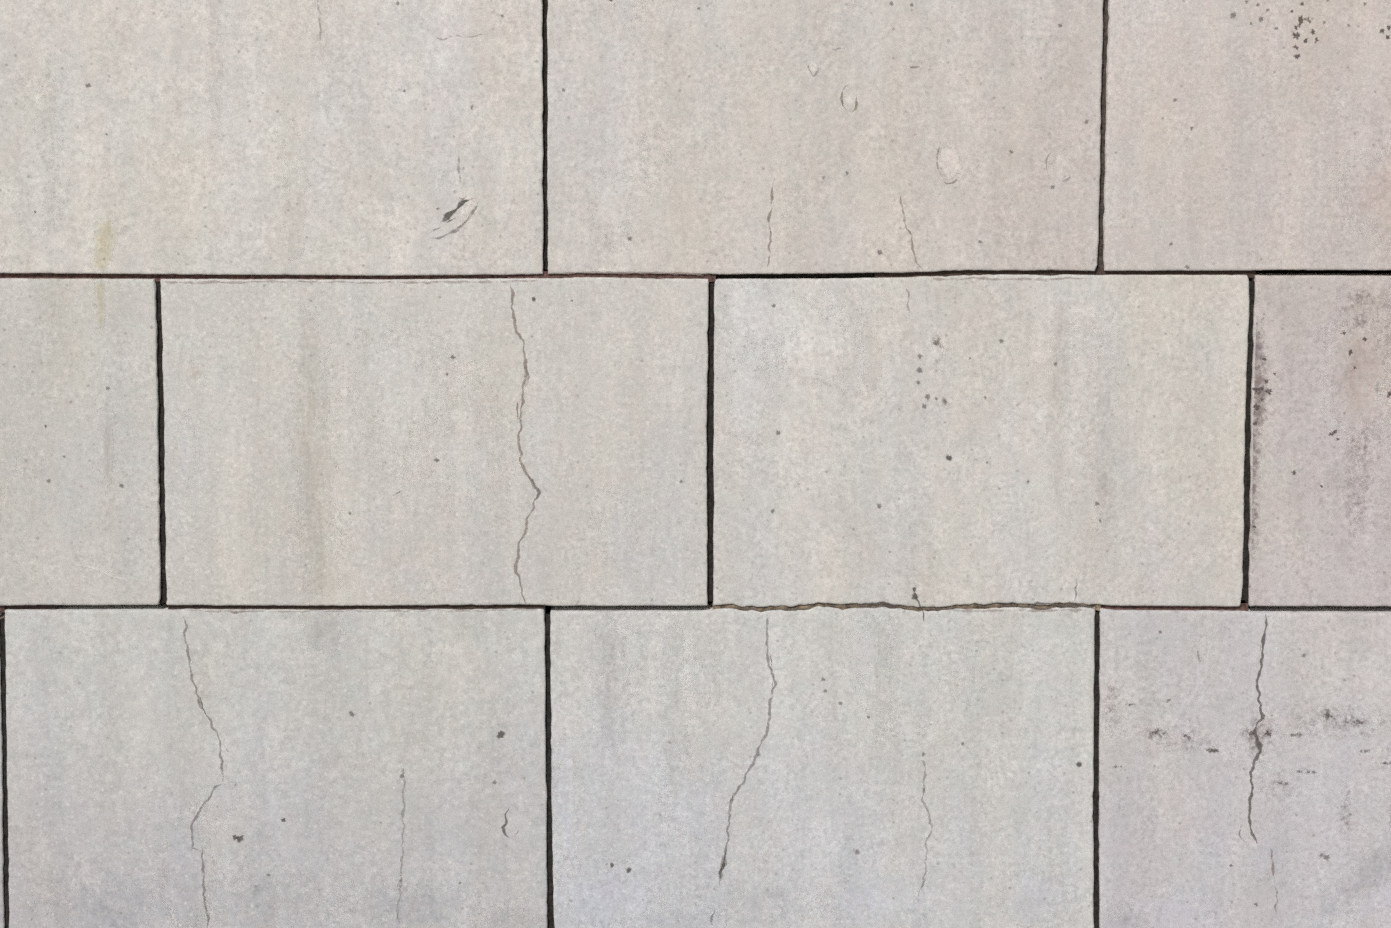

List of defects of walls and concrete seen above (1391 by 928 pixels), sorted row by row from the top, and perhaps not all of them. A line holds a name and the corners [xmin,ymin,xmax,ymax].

crack [511,291,540,600]
crack [183,619,223,927]
crack [719,586,1094,878]
crack [1239,614,1276,908]